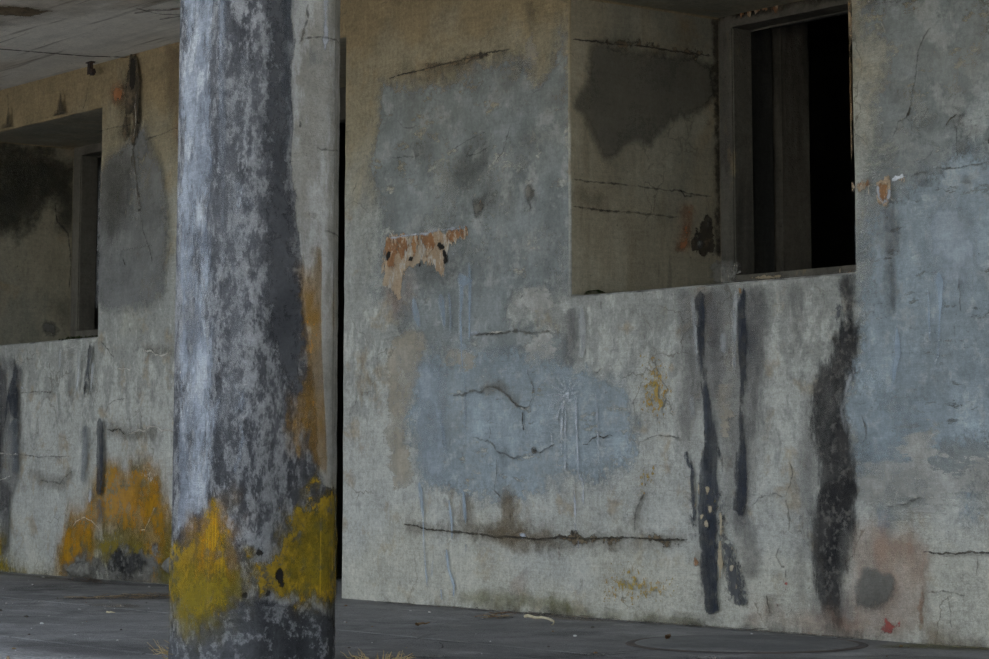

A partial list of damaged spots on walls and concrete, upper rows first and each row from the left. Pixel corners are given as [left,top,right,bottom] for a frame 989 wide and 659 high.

damp [573,39,715,159]
damp [0,143,73,285]
damp [176,0,224,529]
peeling [290,0,340,490]
spalling [381,226,468,300]
damp [82,419,103,502]
crack [453,386,553,496]
damp [684,275,802,614]
damp [809,271,858,629]
crack [404,494,685,548]
crack [925,551,989,568]
damp [168,600,335,659]